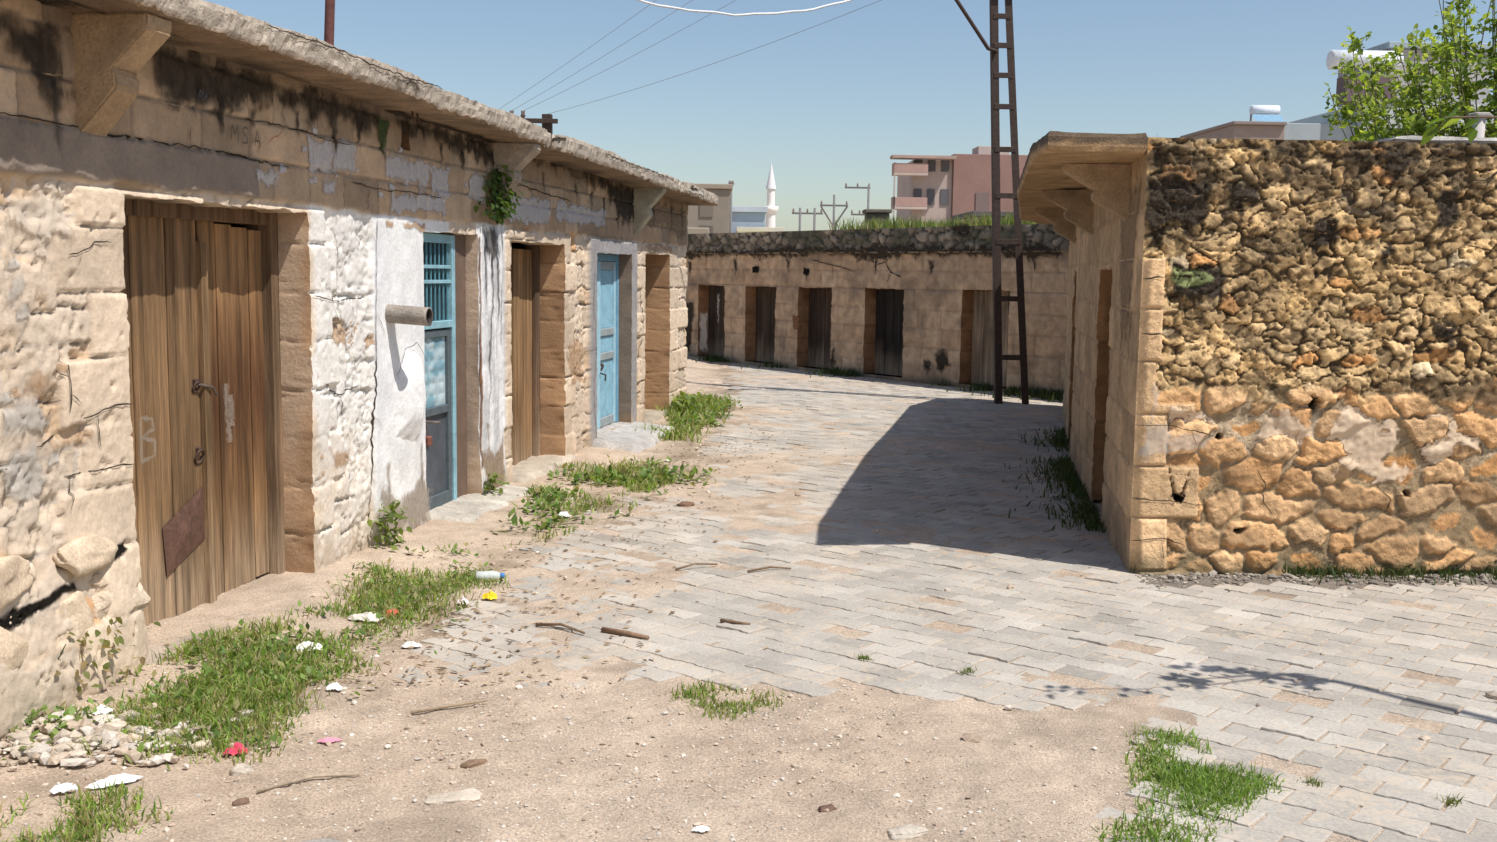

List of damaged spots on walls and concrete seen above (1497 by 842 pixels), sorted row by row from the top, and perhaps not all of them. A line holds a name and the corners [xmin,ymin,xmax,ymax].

water stain [0,15,63,134]
flaking render [1169,406,1215,435]
flaking render [1256,405,1480,485]